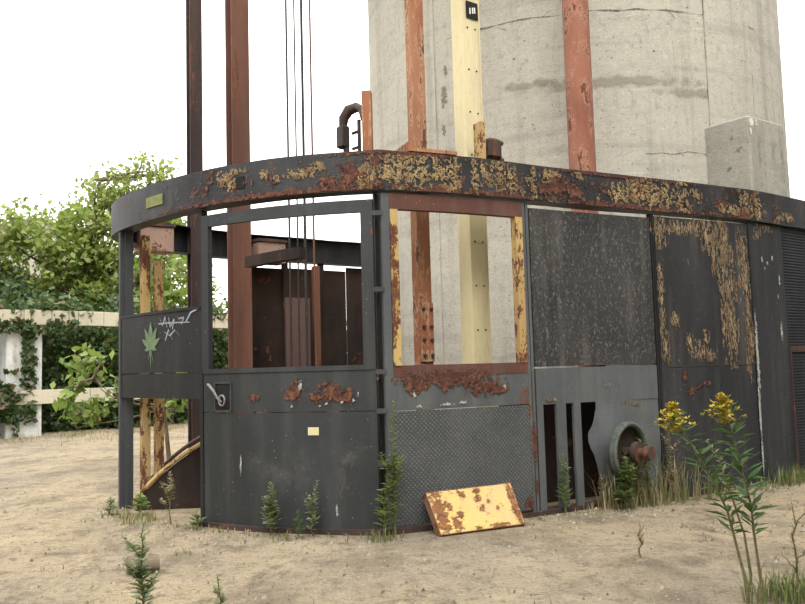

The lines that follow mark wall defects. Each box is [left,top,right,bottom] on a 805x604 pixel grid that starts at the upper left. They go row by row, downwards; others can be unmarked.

peeling [216,169,247,192]
peeling [259,162,326,182]
peeling [357,151,561,203]
peeling [597,176,794,475]
rust [281,378,359,406]
rust [391,368,512,398]